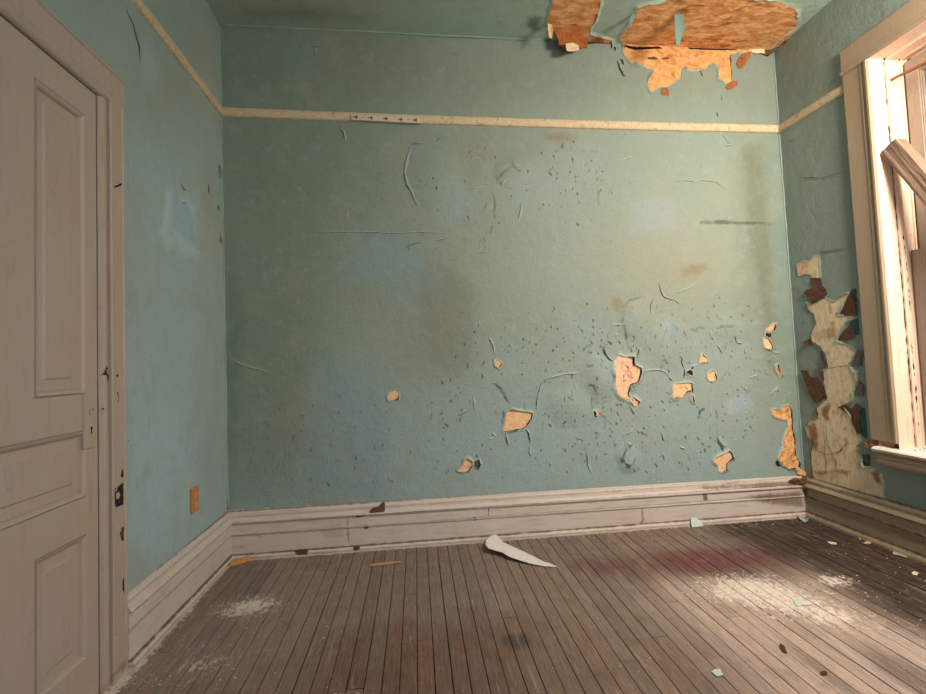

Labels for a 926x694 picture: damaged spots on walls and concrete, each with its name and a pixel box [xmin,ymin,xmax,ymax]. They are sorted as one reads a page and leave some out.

flaking render [624,44,751,92]
flaking render [477,303,784,475]
flaking render [428,444,492,475]
spalling [861,440,897,449]